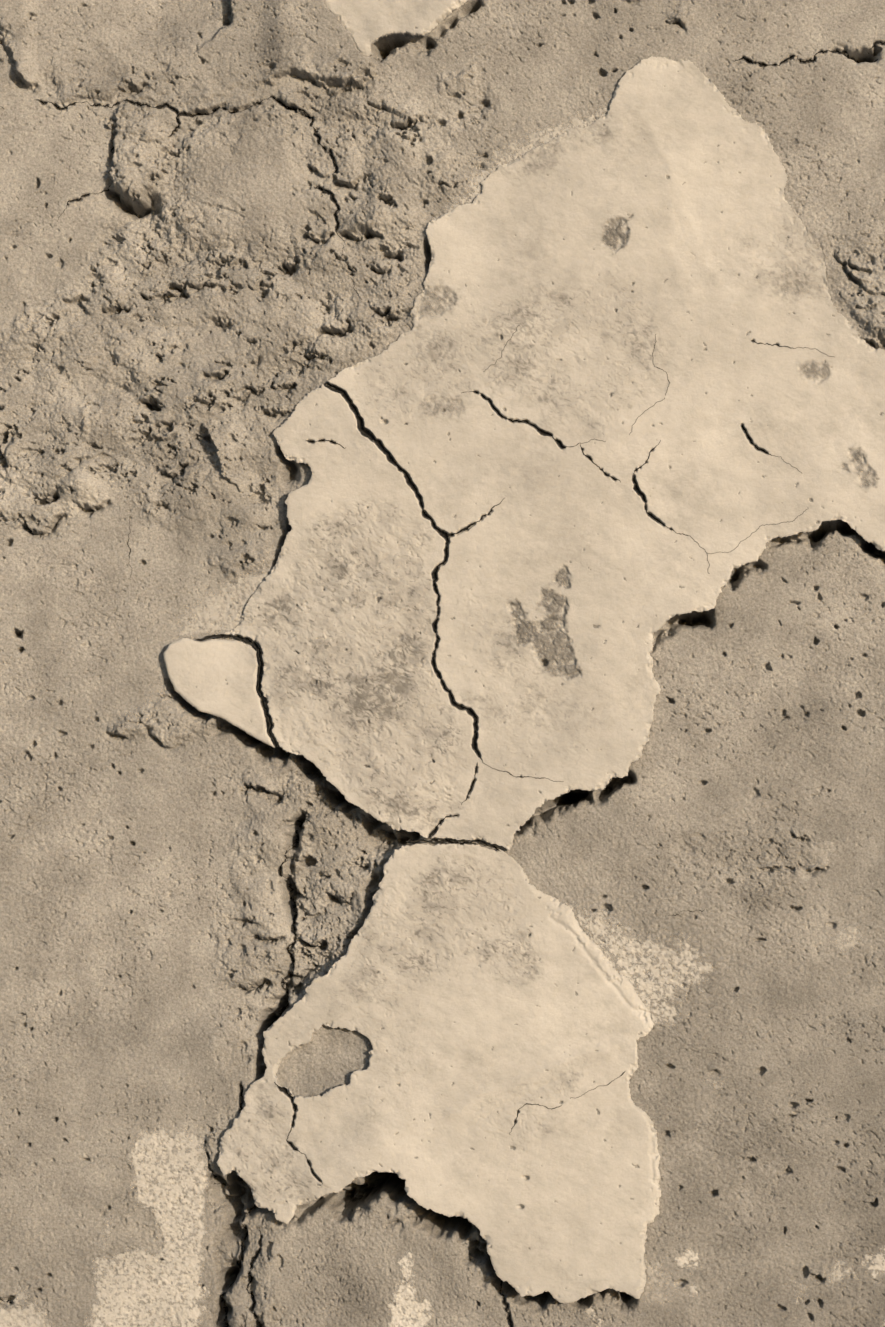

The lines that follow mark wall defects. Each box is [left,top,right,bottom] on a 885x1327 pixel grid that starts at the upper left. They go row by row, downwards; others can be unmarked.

peeling [0,0,467,107]
crack [734,41,885,66]
crack [36,96,362,300]
peeling [0,56,885,850]
crack [462,325,807,574]
crack [196,634,278,747]
crack [306,383,564,851]
crack [278,818,305,1017]
crack [239,1067,323,1184]
peeling [204,771,661,1327]
crack [205,1139,262,1327]